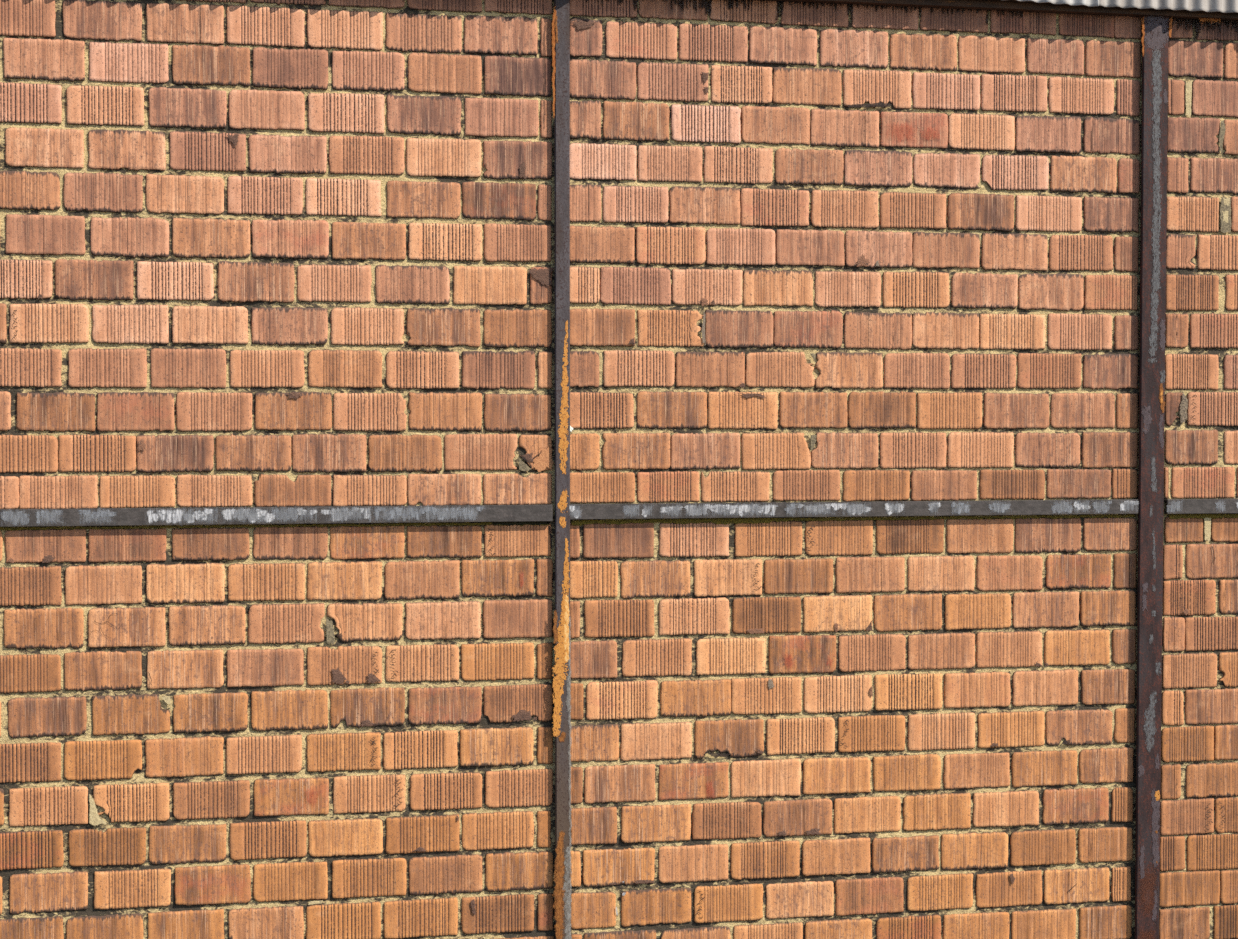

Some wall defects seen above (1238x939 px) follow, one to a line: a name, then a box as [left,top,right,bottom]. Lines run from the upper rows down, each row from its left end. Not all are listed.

corrosion [553,831,566,939]